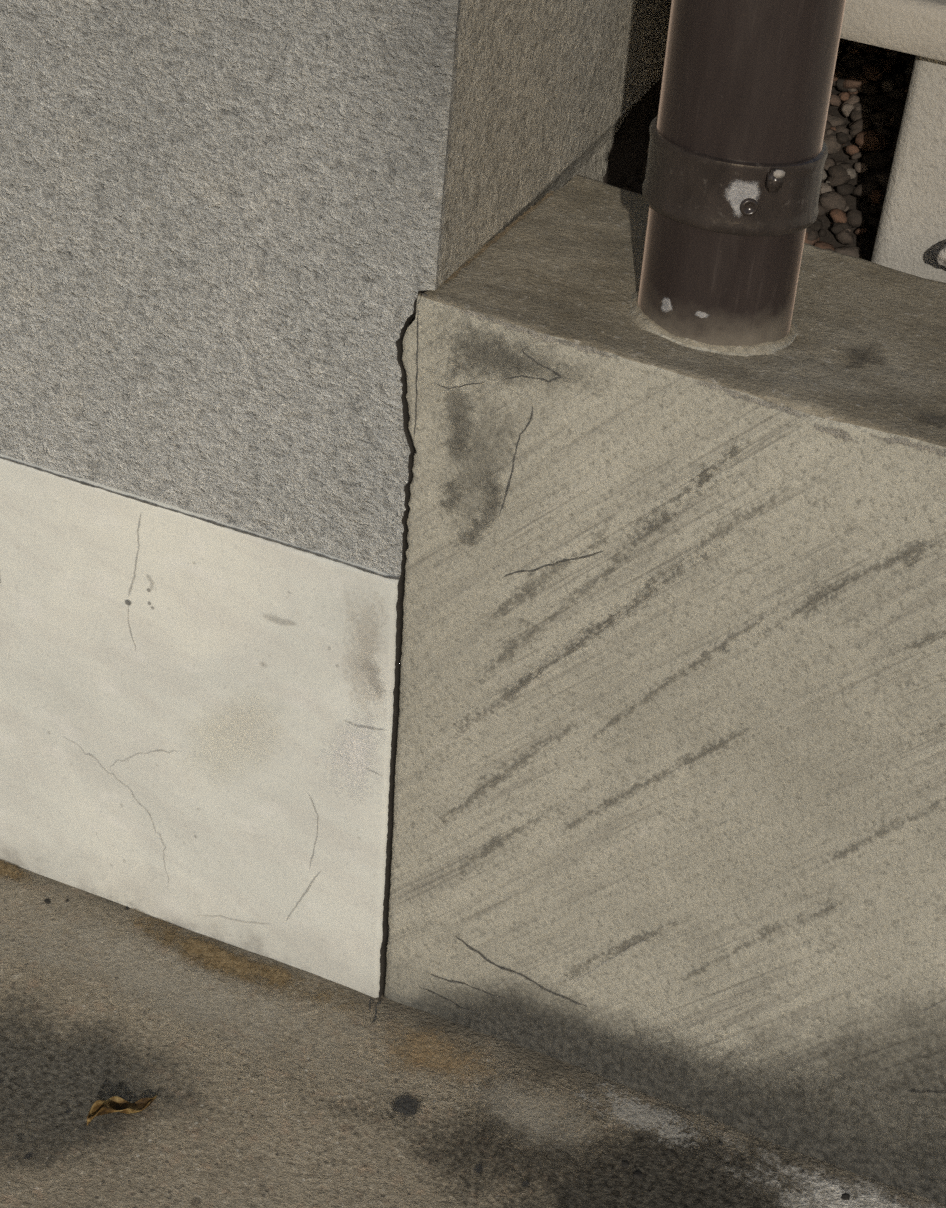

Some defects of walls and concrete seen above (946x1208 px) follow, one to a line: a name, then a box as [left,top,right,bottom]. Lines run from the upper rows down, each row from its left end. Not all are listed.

crack [0,191,554,1024]
damp [35,922,299,1044]
damp [416,988,946,1208]